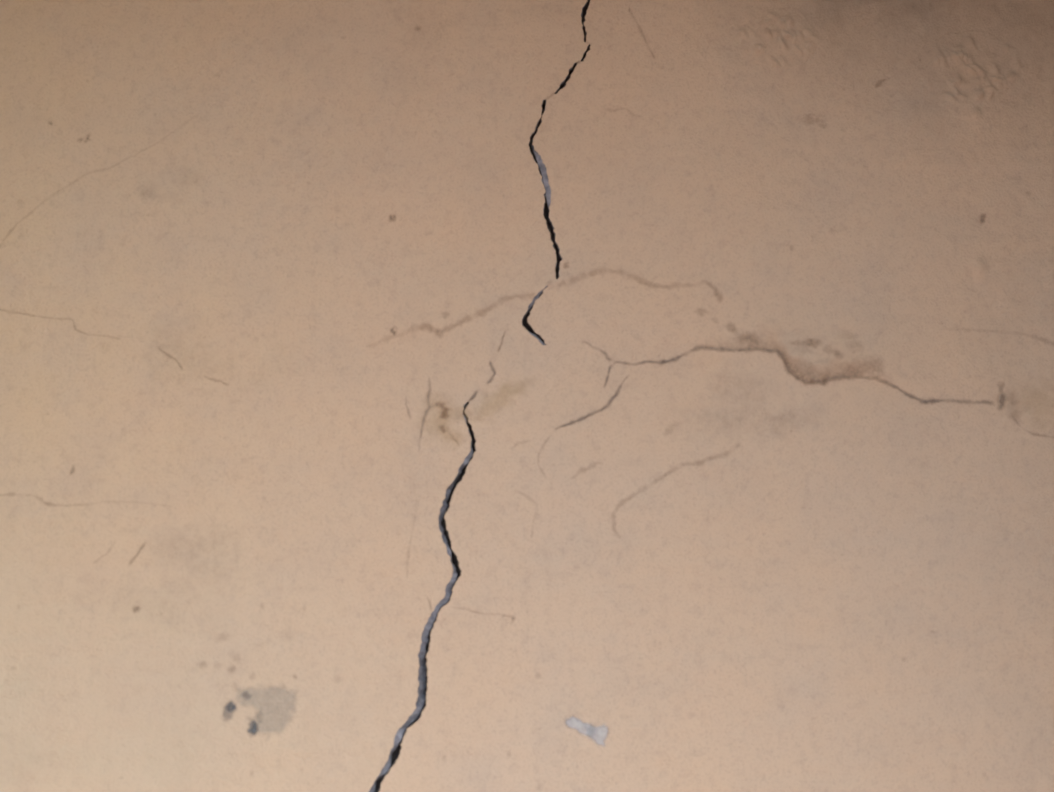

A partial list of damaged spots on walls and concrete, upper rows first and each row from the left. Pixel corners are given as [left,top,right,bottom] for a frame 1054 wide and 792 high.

crack [522,0,590,345]
crack [369,395,476,792]
peeling [566,717,608,745]